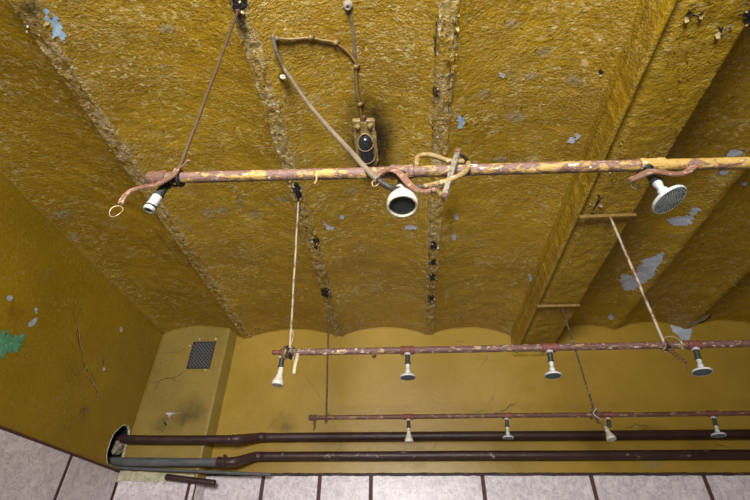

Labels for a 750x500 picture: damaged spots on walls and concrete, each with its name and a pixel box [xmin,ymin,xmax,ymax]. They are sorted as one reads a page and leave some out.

peeling [9,1,67,57]
peeling [428,1,466,106]
peeling [430,111,468,155]
peeling [726,149,747,157]
peeling [666,207,702,227]
peeling [619,251,665,292]
peeling [0,307,38,359]
peeling [670,315,712,341]
crack [73,310,105,402]